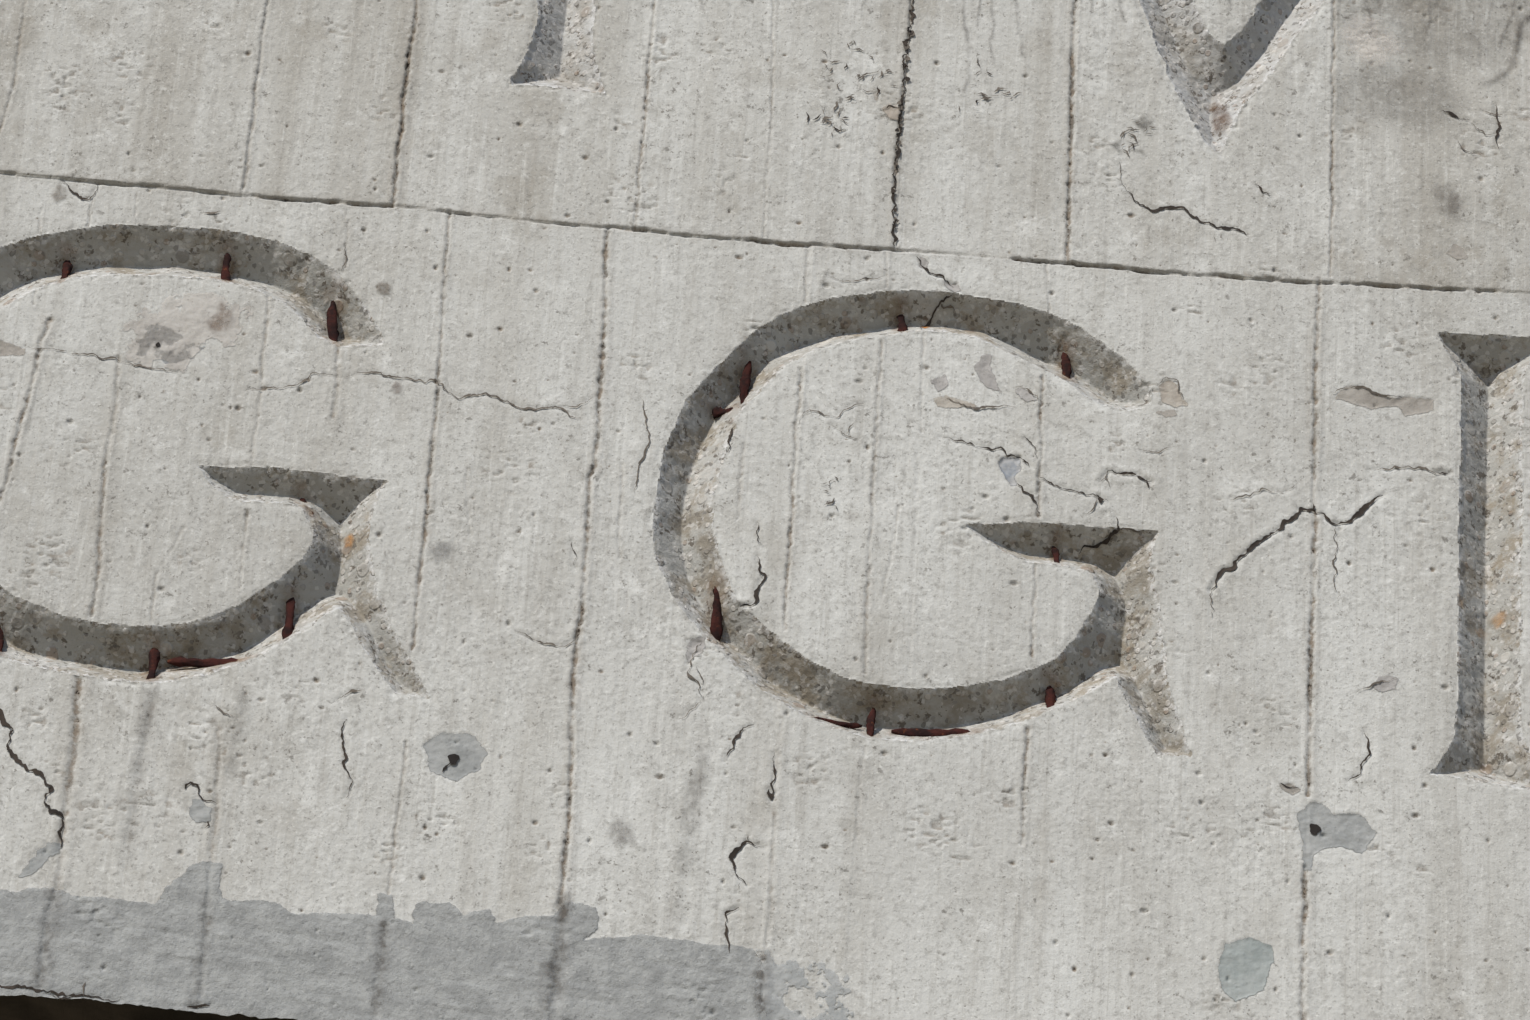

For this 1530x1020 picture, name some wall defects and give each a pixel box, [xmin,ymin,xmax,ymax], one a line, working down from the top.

crack [1120,165,1247,235]
rust [221,253,232,281]
rust [327,300,340,342]
rust [1061,352,1072,379]
rust [712,361,752,419]
crack [1209,465,1449,611]
rust [281,597,295,640]
rust [710,586,723,641]
rust [146,648,238,680]
rust [1044,686,1057,708]
rust [814,707,970,737]
crack [0,708,64,847]